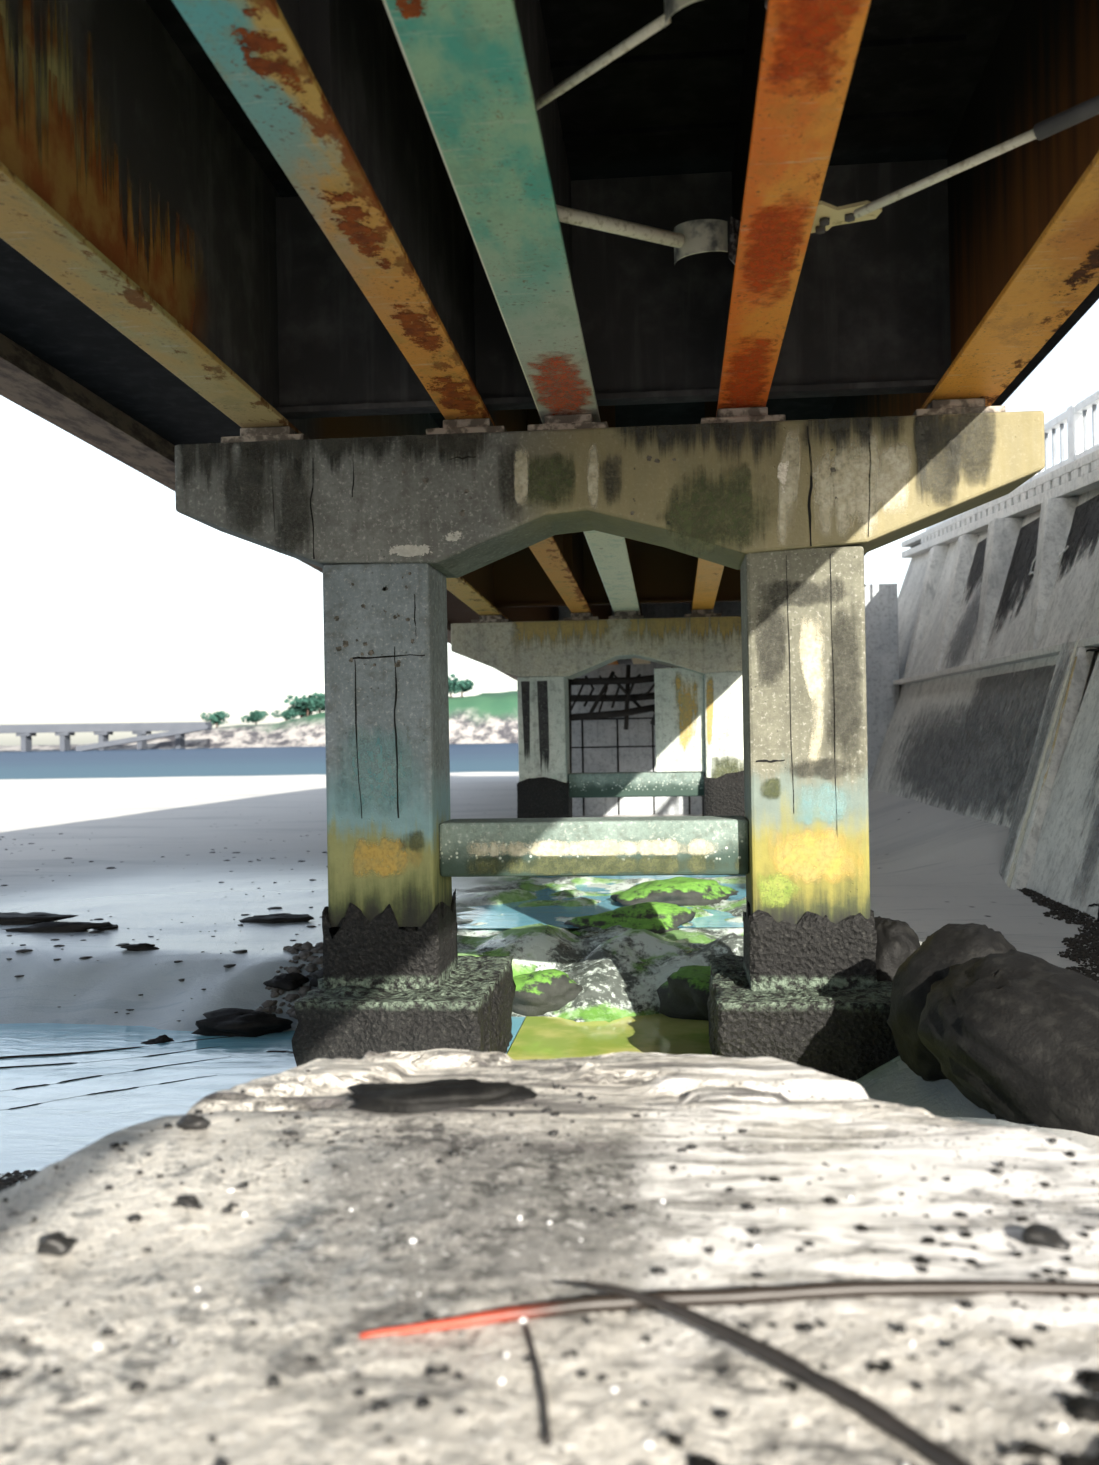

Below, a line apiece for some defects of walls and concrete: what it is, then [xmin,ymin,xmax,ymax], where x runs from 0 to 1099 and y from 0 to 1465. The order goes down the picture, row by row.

corrosion [223,0,309,112]
corrosion [395,0,427,19]
corrosion [0,0,196,335]
corrosion [317,189,391,270]
corrosion [1055,244,1099,296]
crack [756,440,838,838]
water stain [620,404,996,553]
water stain [757,581,861,823]
water stain [960,538,987,608]
water stain [890,635,1070,876]
water stain [986,517,1040,657]
water stain [1055,495,1099,585]